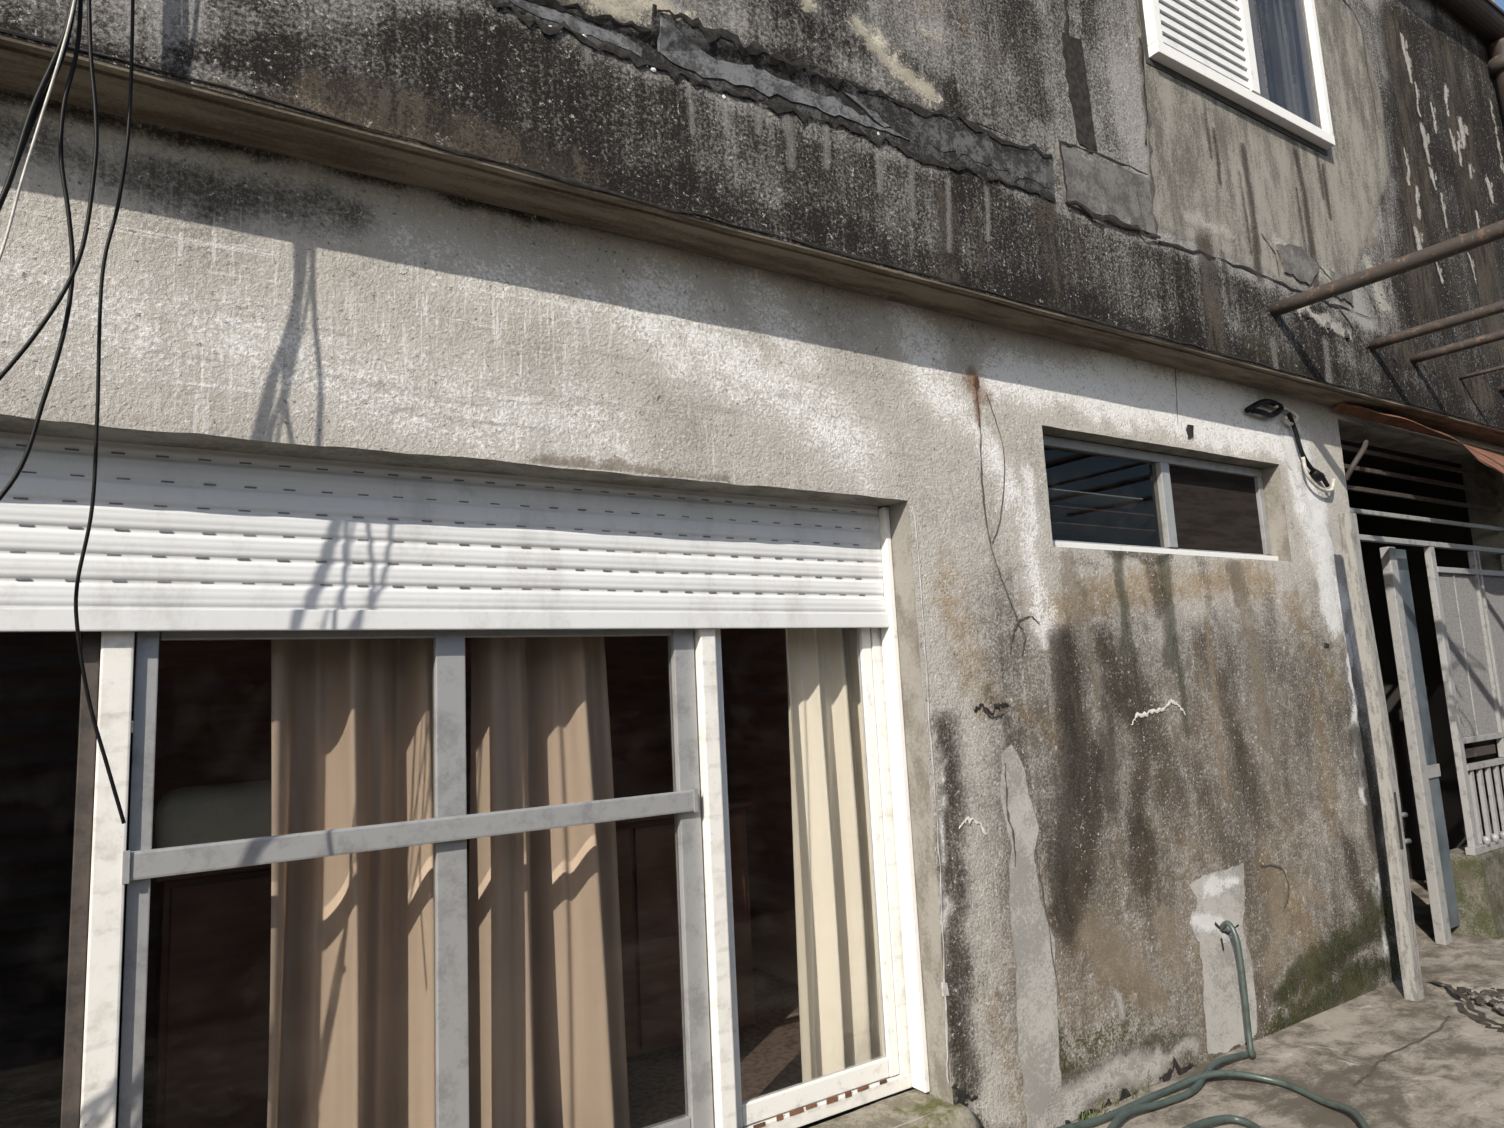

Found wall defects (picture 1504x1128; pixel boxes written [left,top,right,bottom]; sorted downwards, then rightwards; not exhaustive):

leakage [310,73,600,185]
crack [0,0,1504,429]
flaking render [489,0,1056,202]
leakage [1207,129,1221,185]
leakage [1239,145,1263,281]
leakage [1293,149,1332,287]
leakage [1382,11,1504,365]
leakage [1048,556,1117,941]
leakage [1113,551,1144,728]
leakage [1157,555,1189,737]
leakage [1226,560,1283,803]
leakage [1350,723,1388,911]